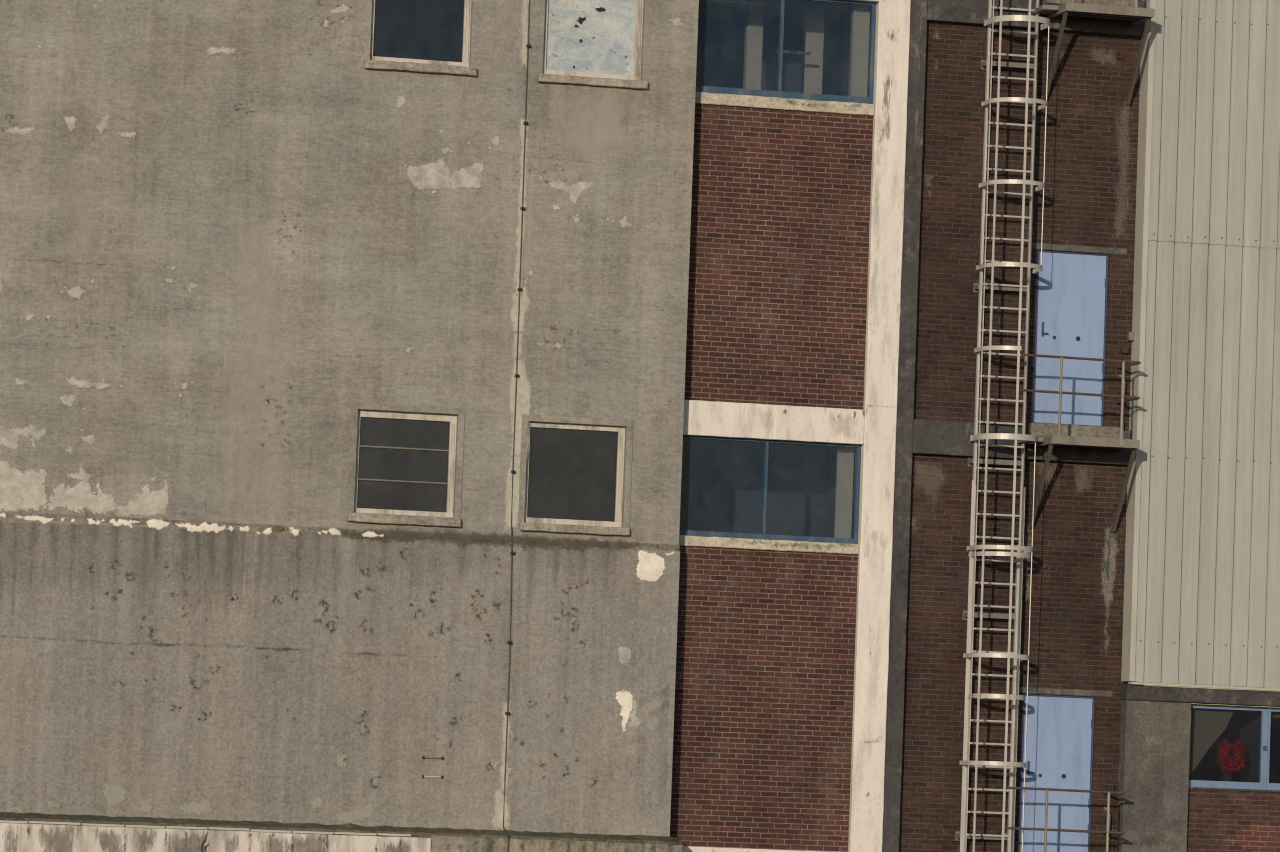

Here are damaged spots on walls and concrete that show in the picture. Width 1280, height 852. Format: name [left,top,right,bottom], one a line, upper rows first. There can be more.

peeling [206,46,241,61]
peeling [404,129,501,194]
peeling [538,175,597,224]
peeling [0,370,299,536]
spalling [636,550,675,583]
peeling [618,646,632,665]
peeling [615,689,641,731]
damp [6,827,73,852]
damp [96,830,204,852]
damp [263,833,328,852]
damp [375,839,409,852]